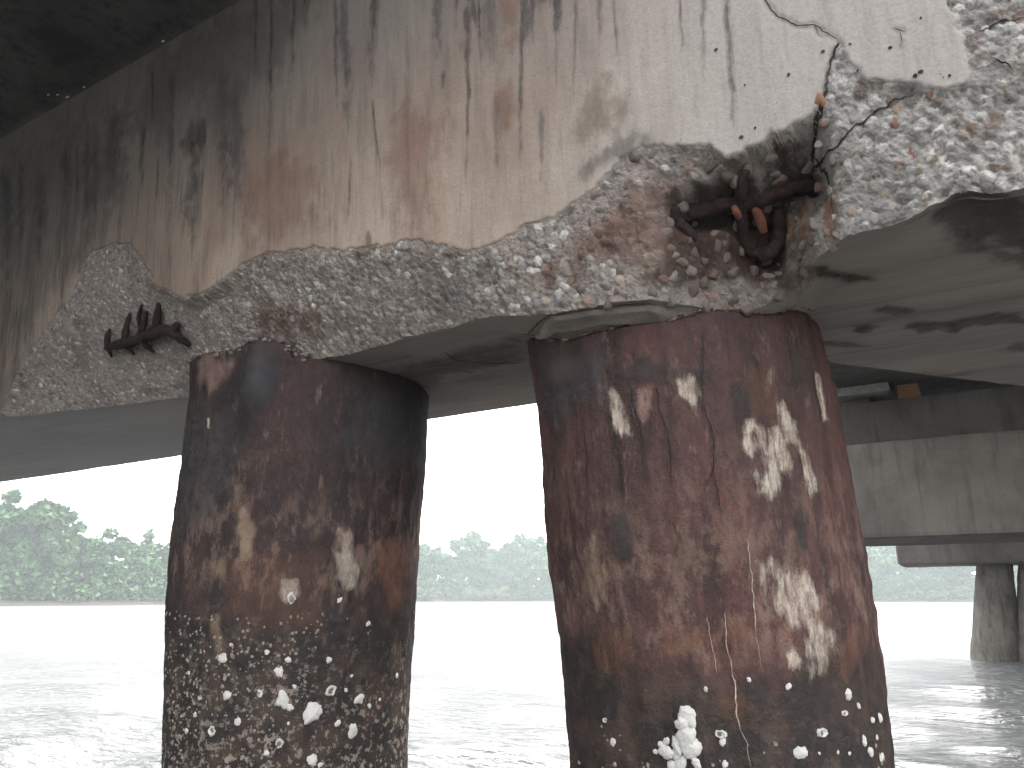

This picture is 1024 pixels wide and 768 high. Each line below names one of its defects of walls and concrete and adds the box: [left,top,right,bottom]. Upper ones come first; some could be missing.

water stain [519,0,560,107]
crack [765,0,917,199]
crack [978,17,1023,32]
spalling [0,0,1024,417]
rust [670,133,820,207]
rust [646,195,869,290]
water stain [609,391,629,434]
crack [608,383,672,499]
crack [701,333,722,515]
water stain [733,384,815,496]
water stain [815,374,826,420]
water stain [771,560,833,662]